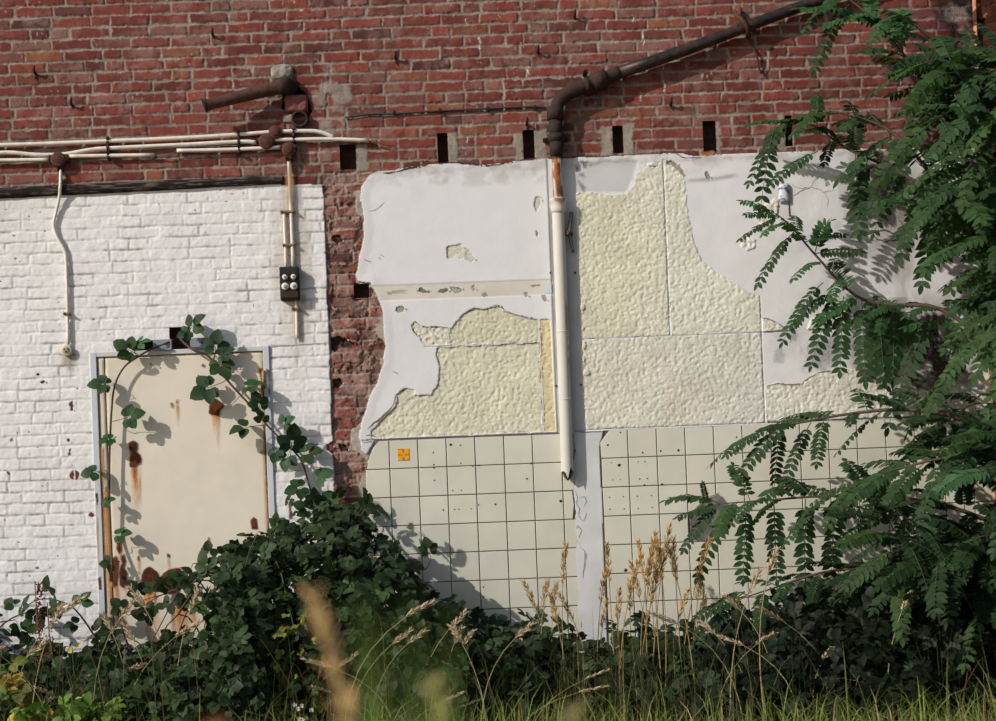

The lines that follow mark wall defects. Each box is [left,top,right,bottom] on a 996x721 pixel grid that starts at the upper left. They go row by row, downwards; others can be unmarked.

rust [551,155,565,201]
flaking render [447,244,476,262]
hole [354,283,370,299]
spalling [331,337,354,352]
rust [209,398,224,420]
peeling [327,442,349,454]
rust [128,441,141,486]
rust [95,491,127,598]
rust [137,556,206,628]